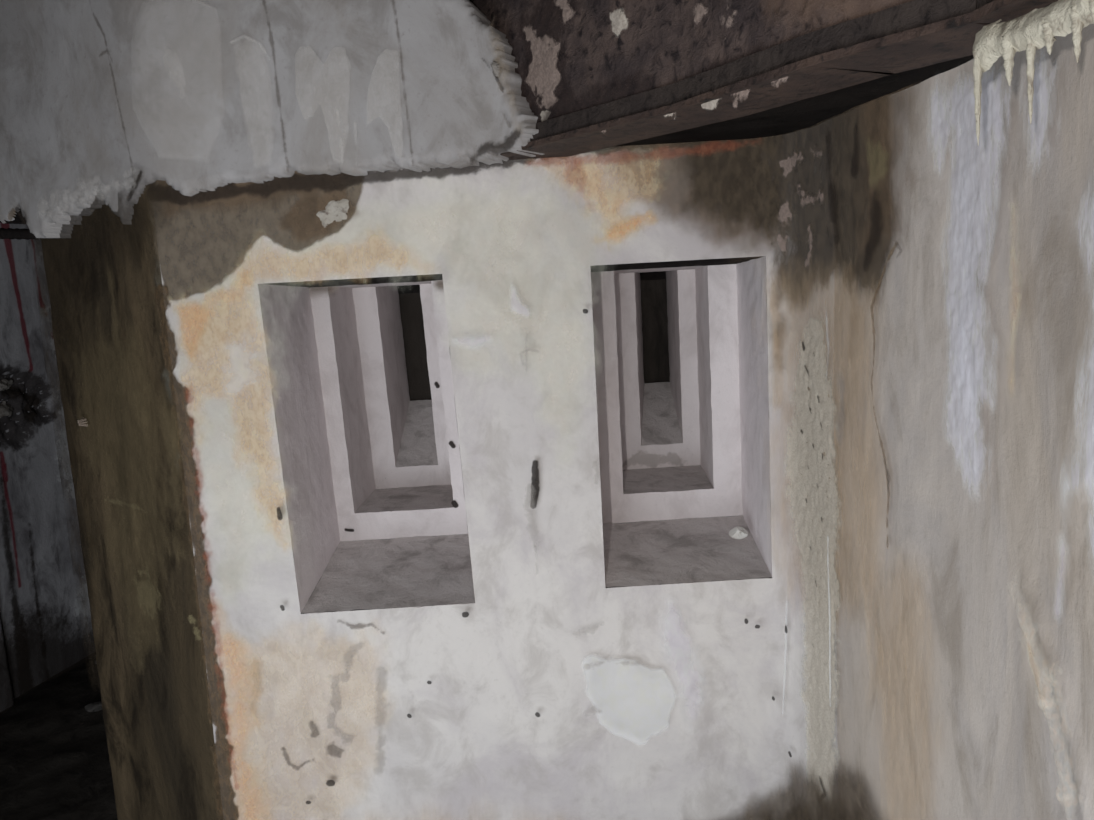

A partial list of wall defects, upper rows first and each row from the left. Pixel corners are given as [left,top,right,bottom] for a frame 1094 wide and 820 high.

corrosion [520,0,575,123]
spalling [0,207,39,240]
spalling [127,171,142,201]
damp [864,193,881,270]
damp [932,0,1094,490]
spalling [0,367,88,498]
crack [871,243,897,548]